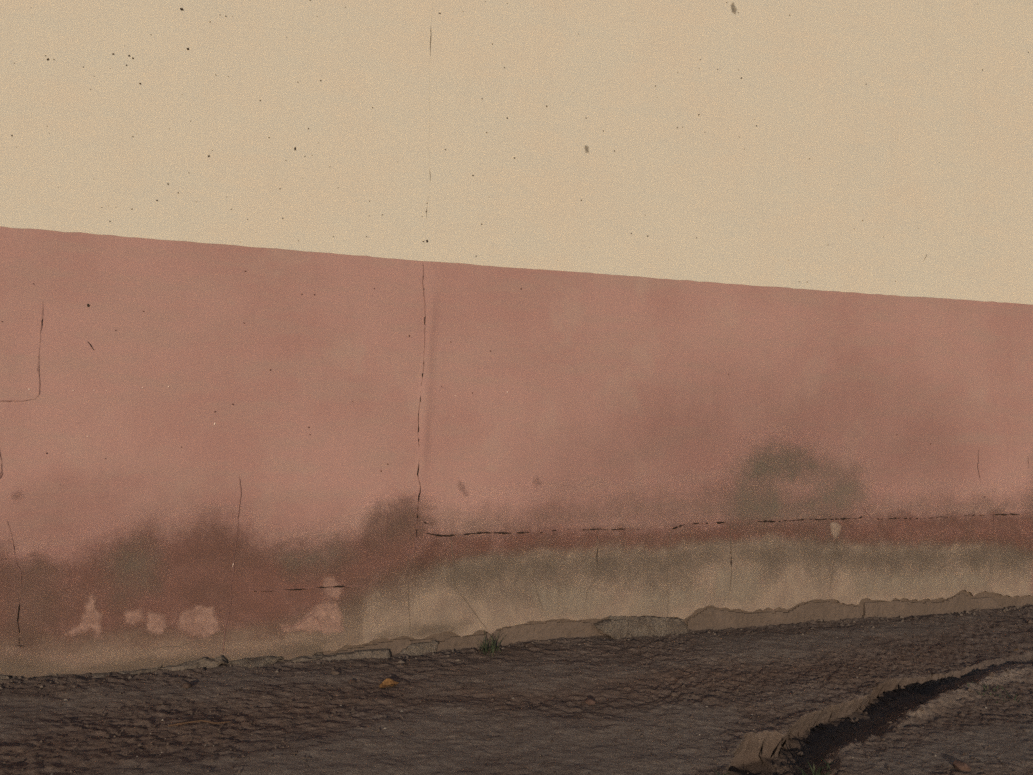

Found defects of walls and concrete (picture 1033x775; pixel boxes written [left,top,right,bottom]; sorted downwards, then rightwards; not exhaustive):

crack [1,301,43,402]
crack [407,8,1022,629]
crack [157,479,368,649]
water stain [0,469,1033,642]